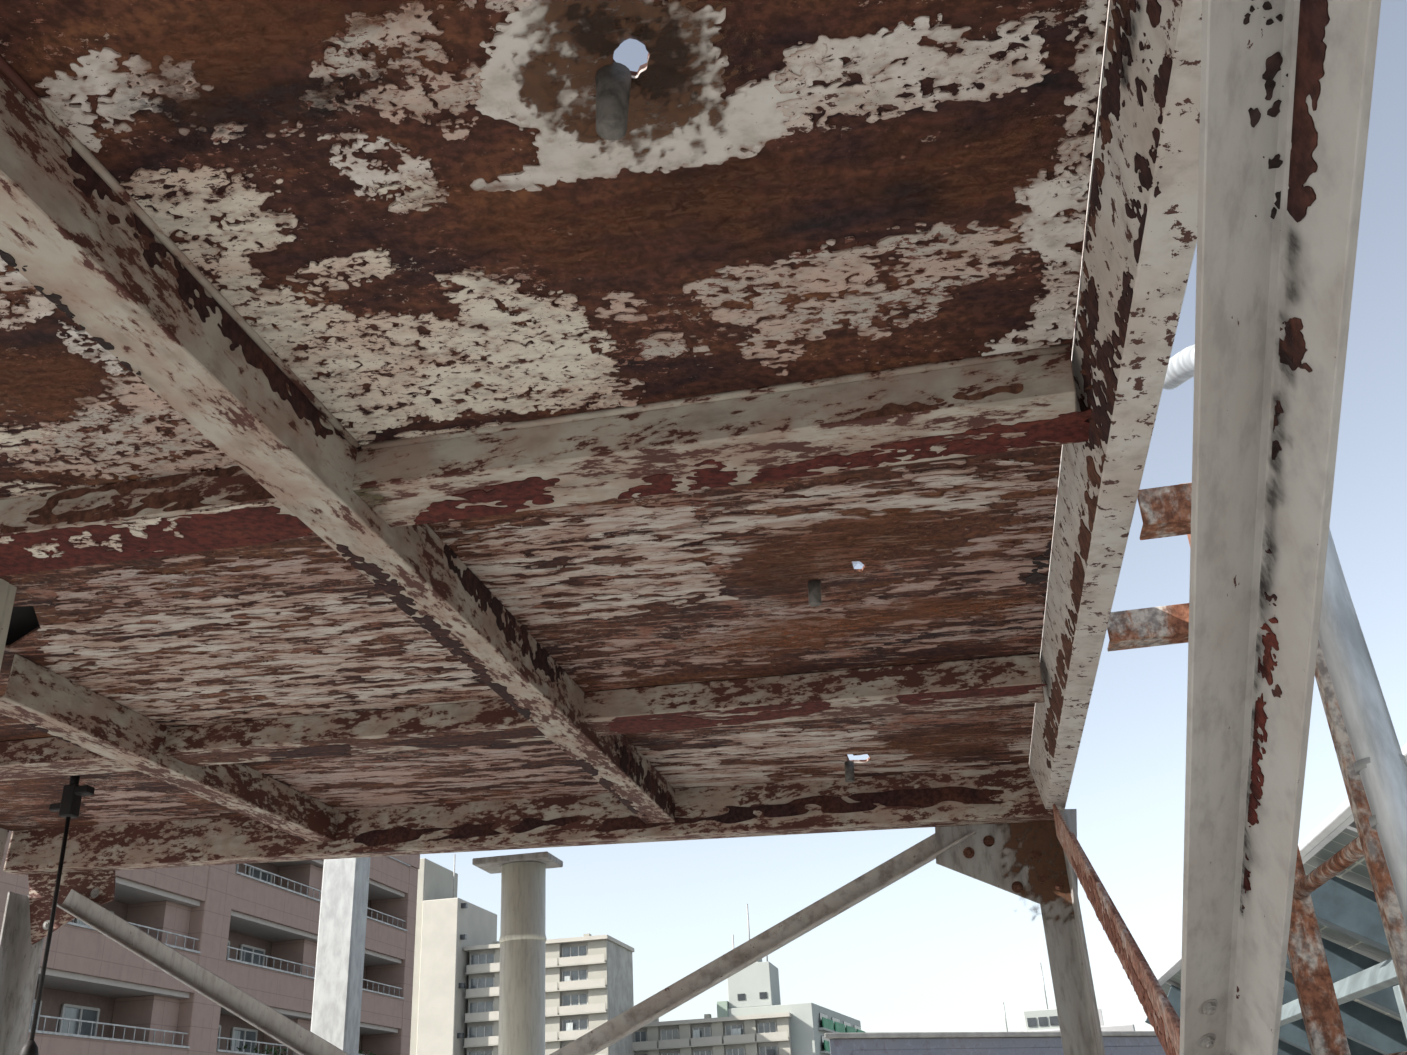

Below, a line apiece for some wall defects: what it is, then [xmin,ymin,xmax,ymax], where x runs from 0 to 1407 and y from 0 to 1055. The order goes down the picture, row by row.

peeling [35,47,214,153]
rust [513,0,763,163]
peeling [266,0,1107,376]
peeling [0,256,239,500]
peeling [120,165,713,446]
rust [618,0,1173,769]
rust [169,544,545,766]
peeling [438,459,1058,687]
rust [562,702,1005,832]
peeling [635,715,1032,788]
rust [1247,592,1282,827]
rust [997,821,1176,1055]